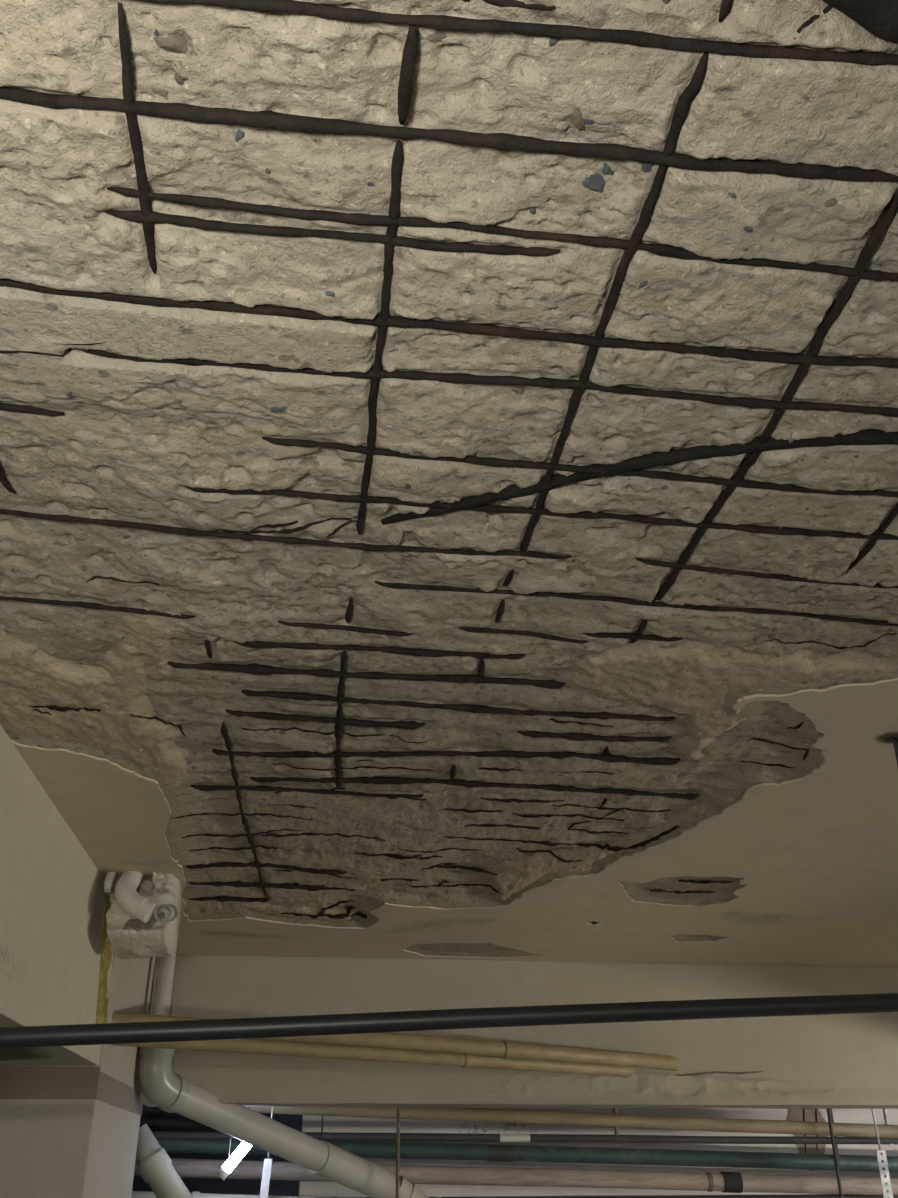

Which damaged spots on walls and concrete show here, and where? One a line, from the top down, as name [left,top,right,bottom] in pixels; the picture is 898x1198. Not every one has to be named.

spalling [0,0,898,927]